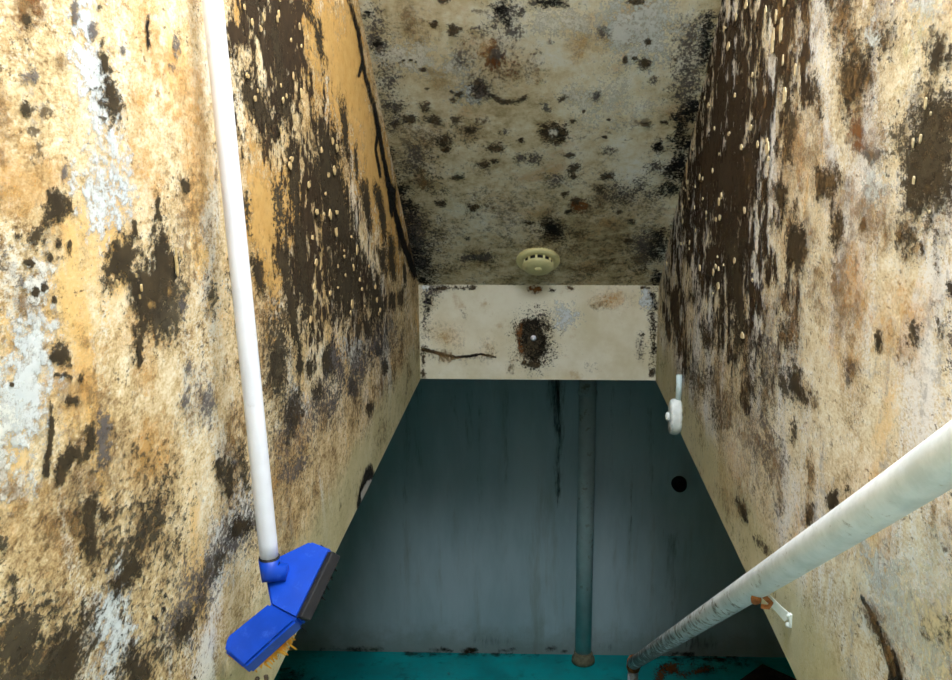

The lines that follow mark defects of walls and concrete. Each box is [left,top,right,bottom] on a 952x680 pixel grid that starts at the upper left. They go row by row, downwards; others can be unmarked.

leakage [0,0,258,680]
crack [425,348,496,362]